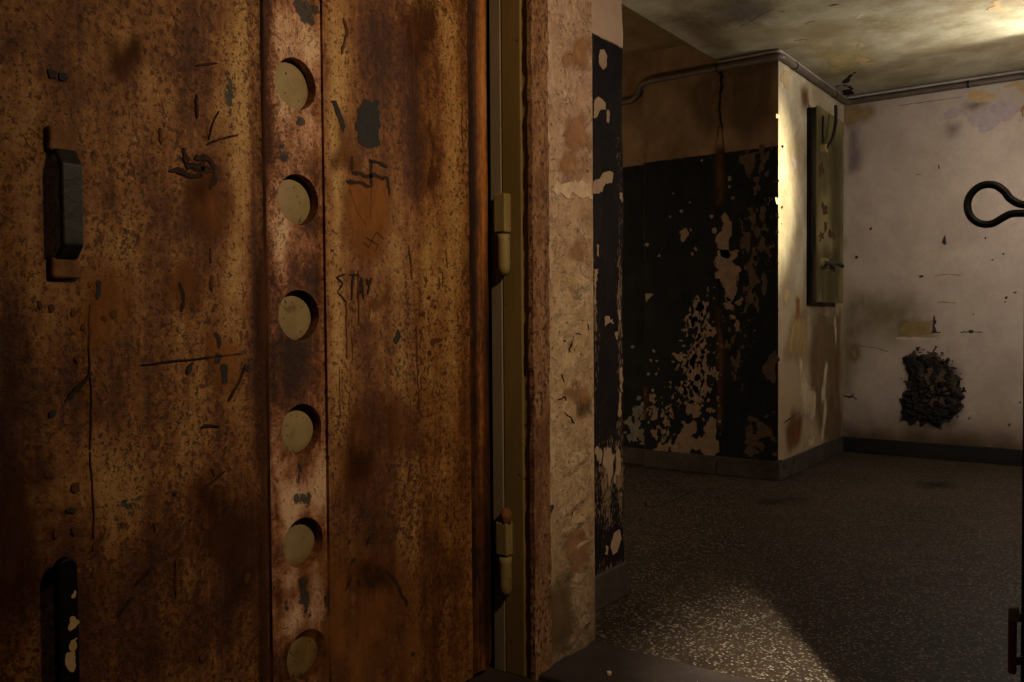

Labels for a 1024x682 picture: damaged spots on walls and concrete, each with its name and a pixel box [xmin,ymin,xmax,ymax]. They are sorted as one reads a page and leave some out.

rust [341,18,349,55]
crack [715,71,725,158]
rust [347,179,390,258]
peeling [595,142,797,487]
rust [80,304,95,539]
rust [259,215,273,682]
spalling [894,315,970,428]
peeling [605,530,622,555]